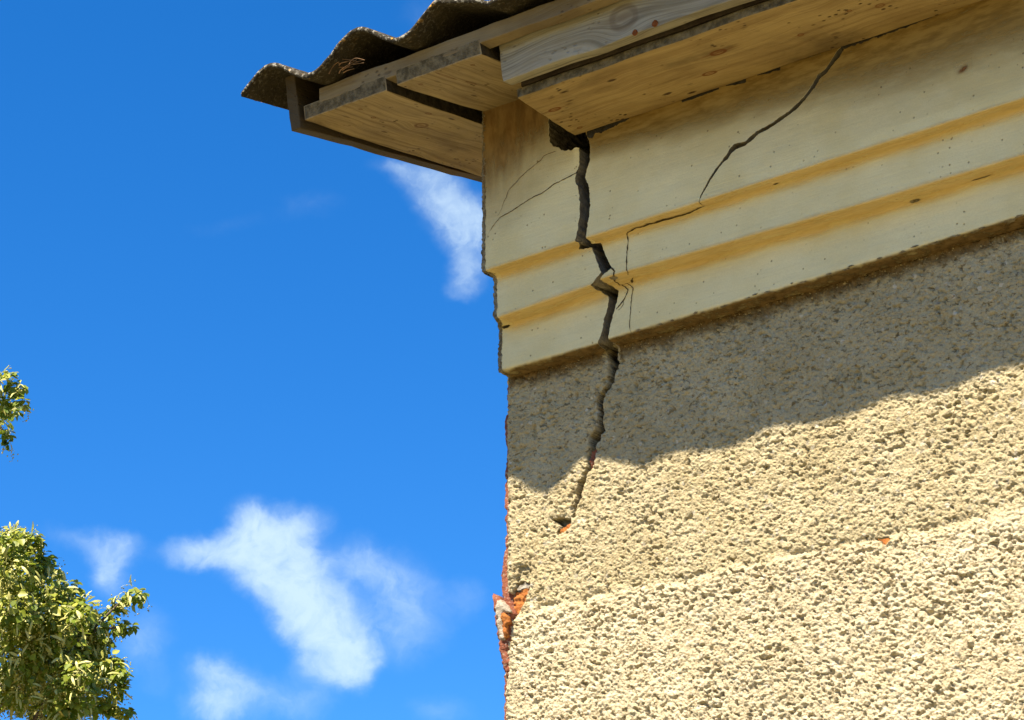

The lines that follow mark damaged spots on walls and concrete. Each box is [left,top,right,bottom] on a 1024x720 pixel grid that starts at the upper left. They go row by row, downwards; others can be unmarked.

crack [487,48,843,352]
peeling [481,111,530,720]
crack [589,450,597,468]